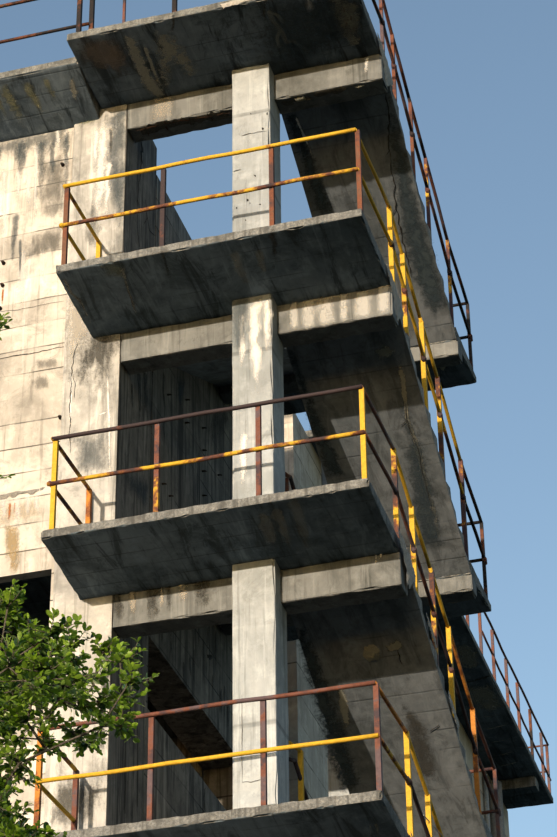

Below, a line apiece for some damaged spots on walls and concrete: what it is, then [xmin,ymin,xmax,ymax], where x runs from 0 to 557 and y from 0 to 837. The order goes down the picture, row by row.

water stain [0,131,68,200]
water stain [93,112,125,210]
water stain [2,173,21,265]
water stain [291,627,360,792]
water stain [403,707,435,776]